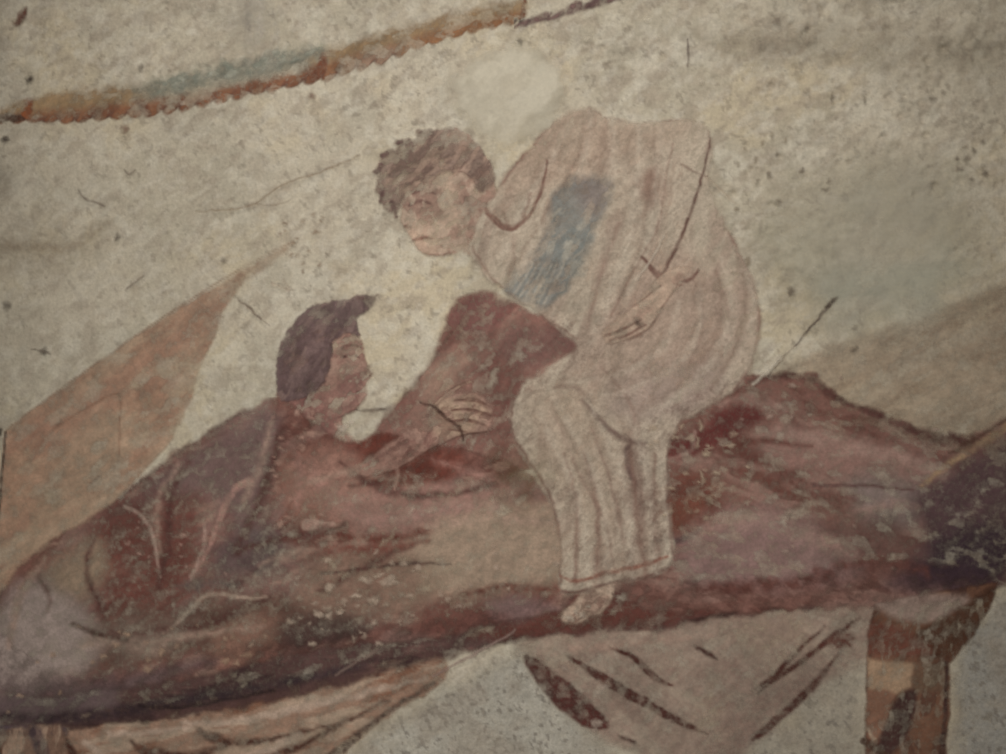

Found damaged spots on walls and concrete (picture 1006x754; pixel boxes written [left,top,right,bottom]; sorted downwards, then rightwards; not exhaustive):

crack [753,299,835,385]
crack [424,404,463,439]